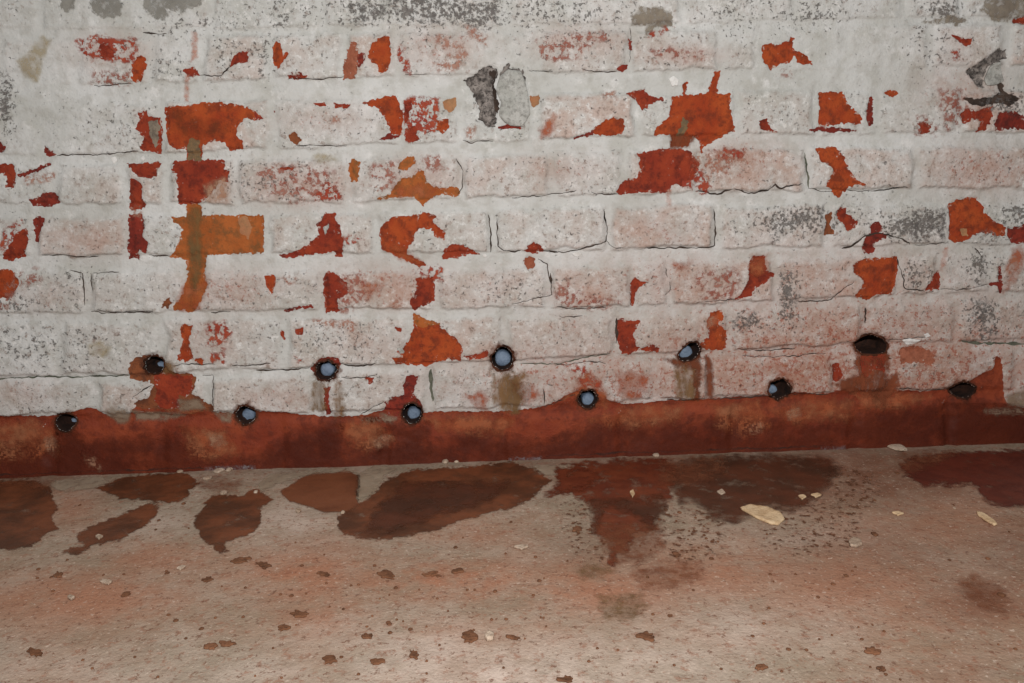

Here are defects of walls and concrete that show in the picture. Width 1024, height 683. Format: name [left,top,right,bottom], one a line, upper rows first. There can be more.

leakage [469,373,525,414]
flaking render [0,36,1024,479]
crack [488,153,908,407]
leakage [900,449,1024,507]